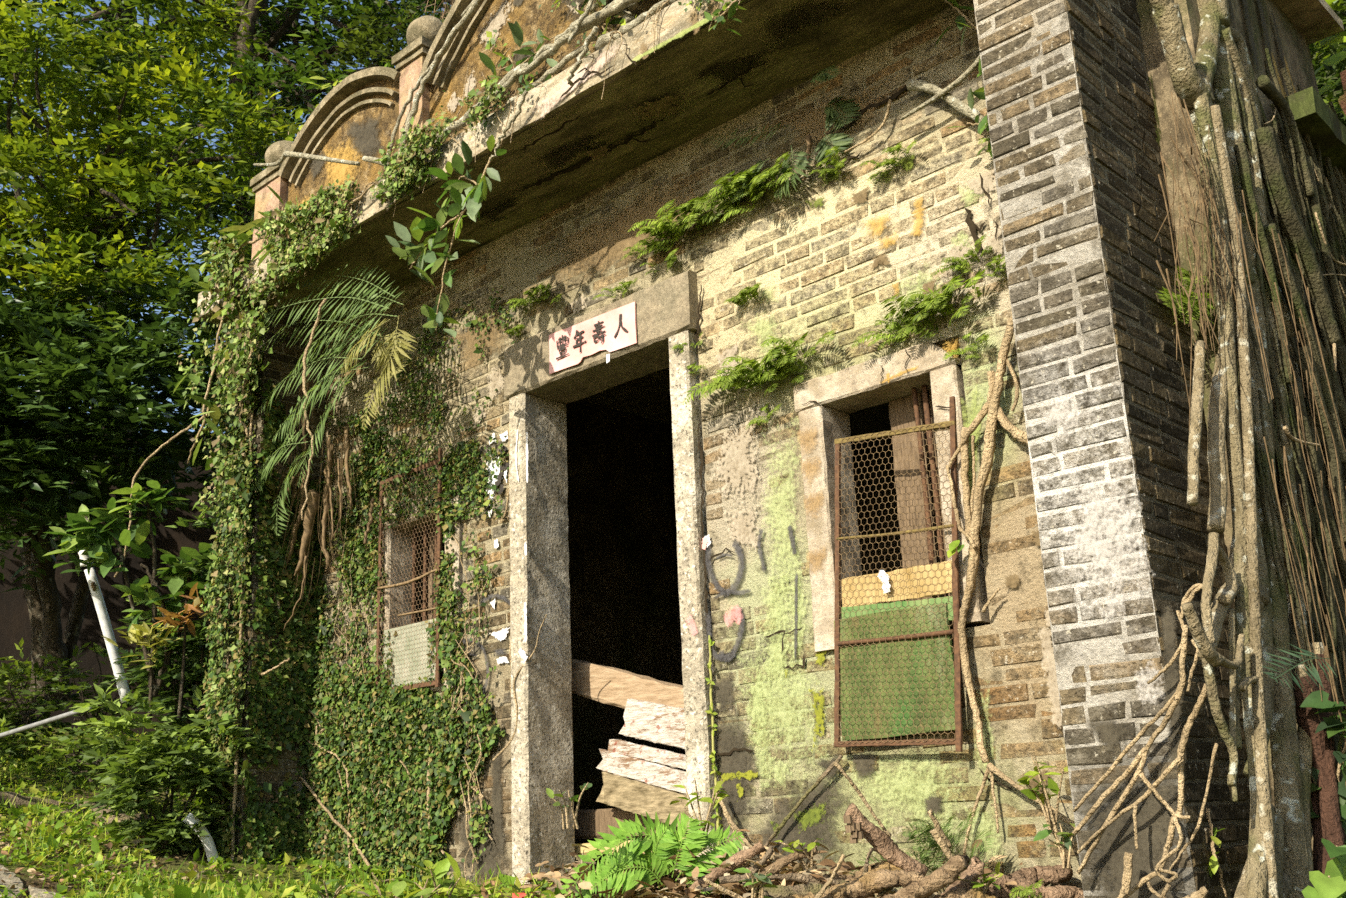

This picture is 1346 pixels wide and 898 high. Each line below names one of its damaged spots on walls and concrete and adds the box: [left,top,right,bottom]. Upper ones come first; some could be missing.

leakage [633,0,720,61]
leakage [538,49,615,116]
leakage [311,117,382,189]
leakage [538,175,714,276]
leakage [452,310,503,367]
leakage [763,579,805,679]
leakage [714,674,876,870]
leakage [925,796,941,816]